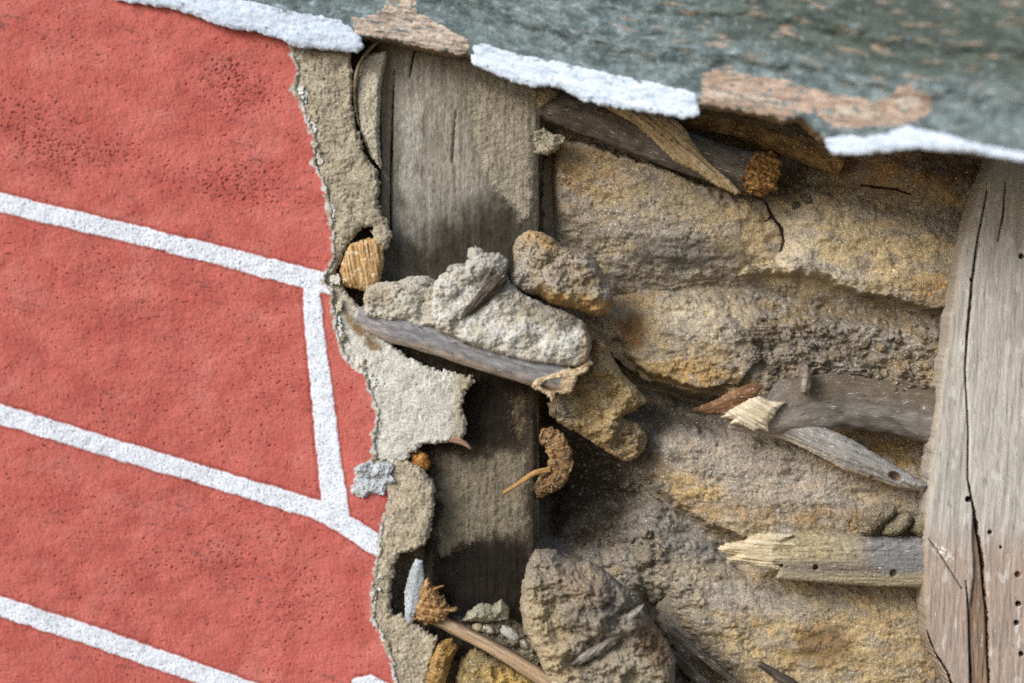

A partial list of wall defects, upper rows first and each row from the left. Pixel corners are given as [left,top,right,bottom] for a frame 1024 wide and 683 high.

peeling [351,0,469,56]
peeling [698,66,932,129]
crack [860,184,911,195]
crack [764,201,785,252]
spalling [293,47,476,683]
crack [926,186,1005,683]